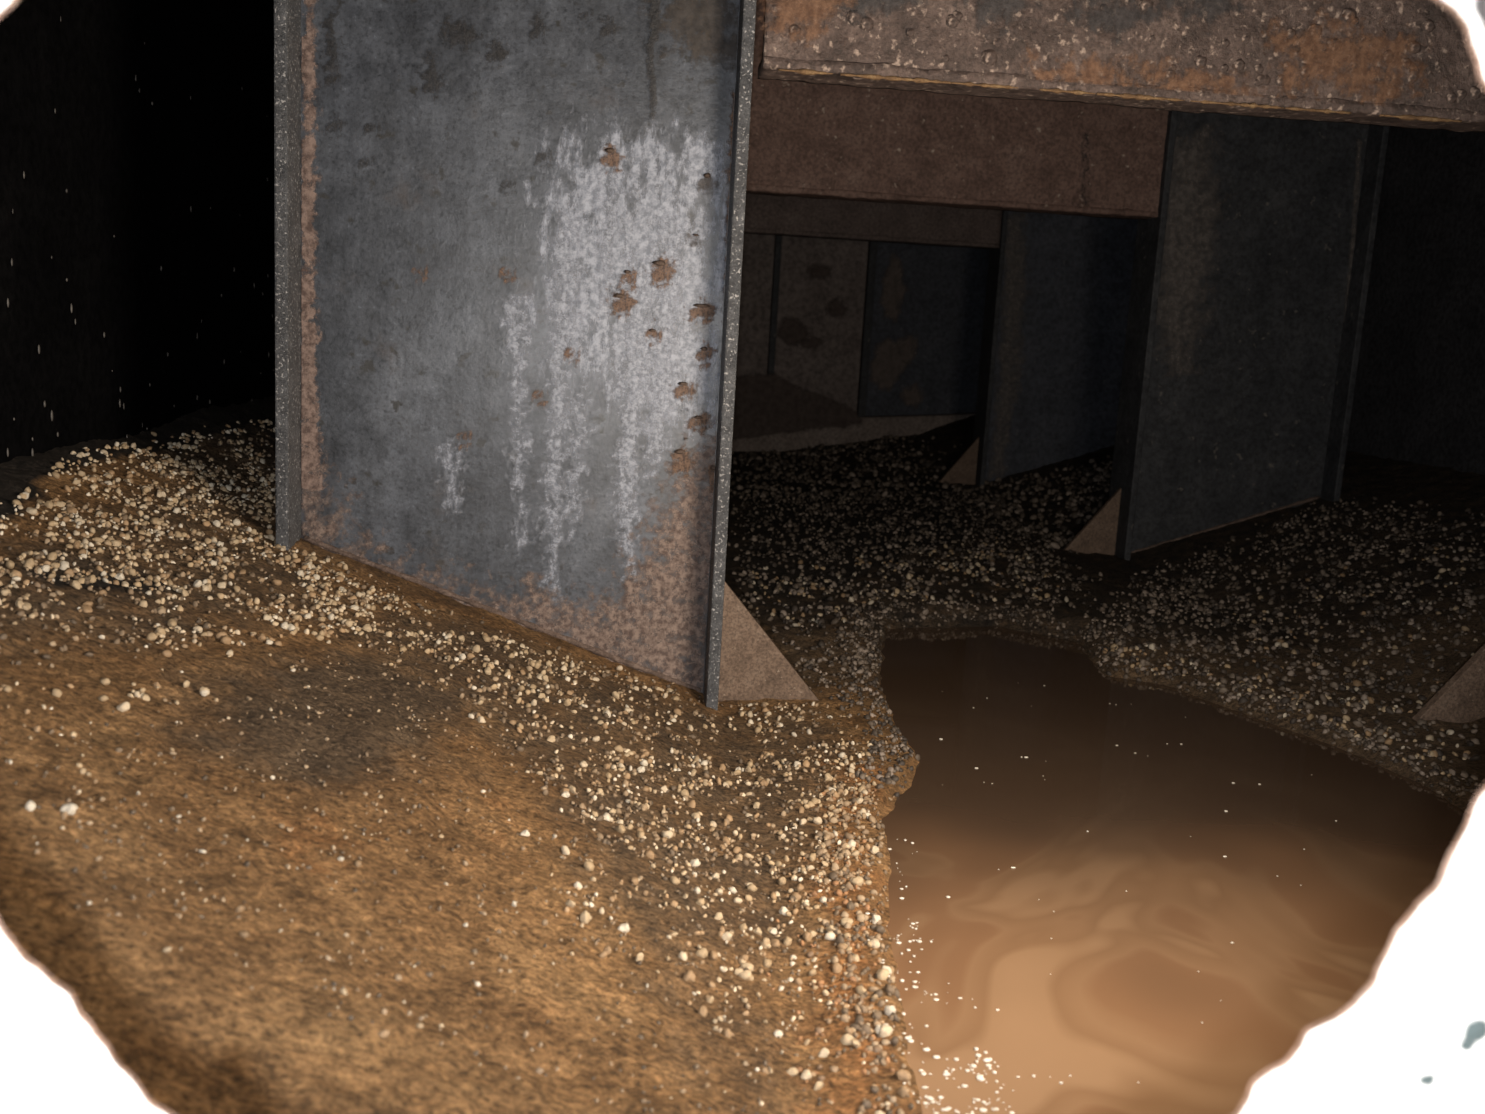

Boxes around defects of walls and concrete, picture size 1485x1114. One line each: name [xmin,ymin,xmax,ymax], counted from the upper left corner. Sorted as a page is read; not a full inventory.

corrosion [1379,19,1485,123]
corrosion [301,0,402,570]
leakage [500,0,738,602]
leakage [437,444,462,512]
corrosion [416,374,862,689]